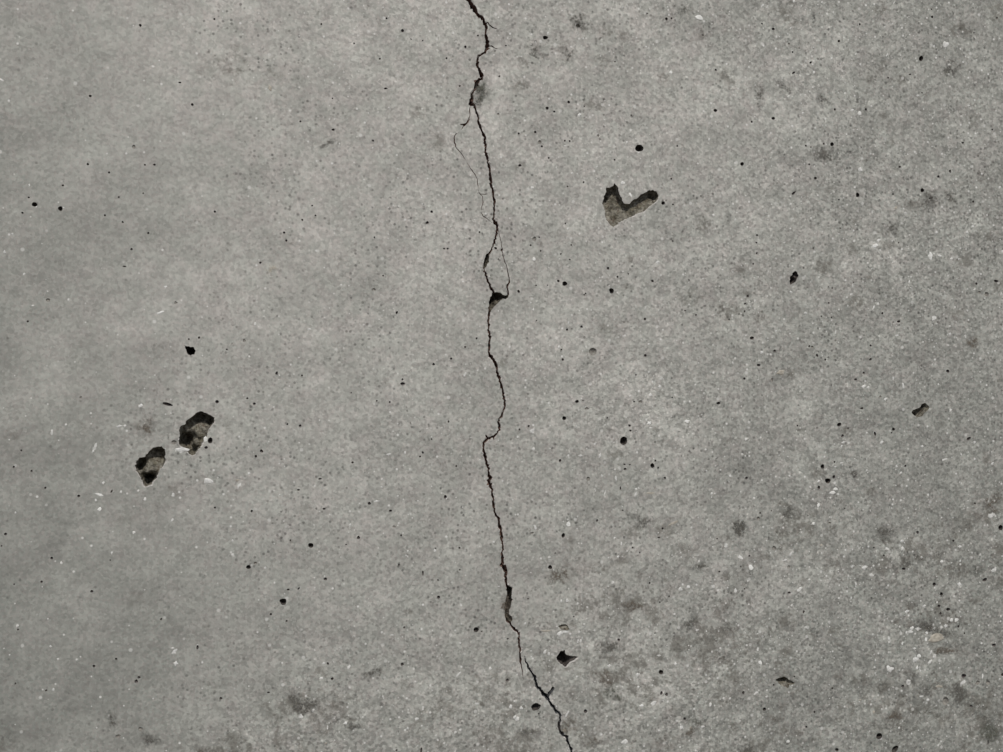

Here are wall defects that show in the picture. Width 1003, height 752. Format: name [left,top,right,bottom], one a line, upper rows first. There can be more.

spalling [602,183,659,228]
crack [454,0,573,752]
spalling [178,411,216,456]
spalling [135,446,168,488]